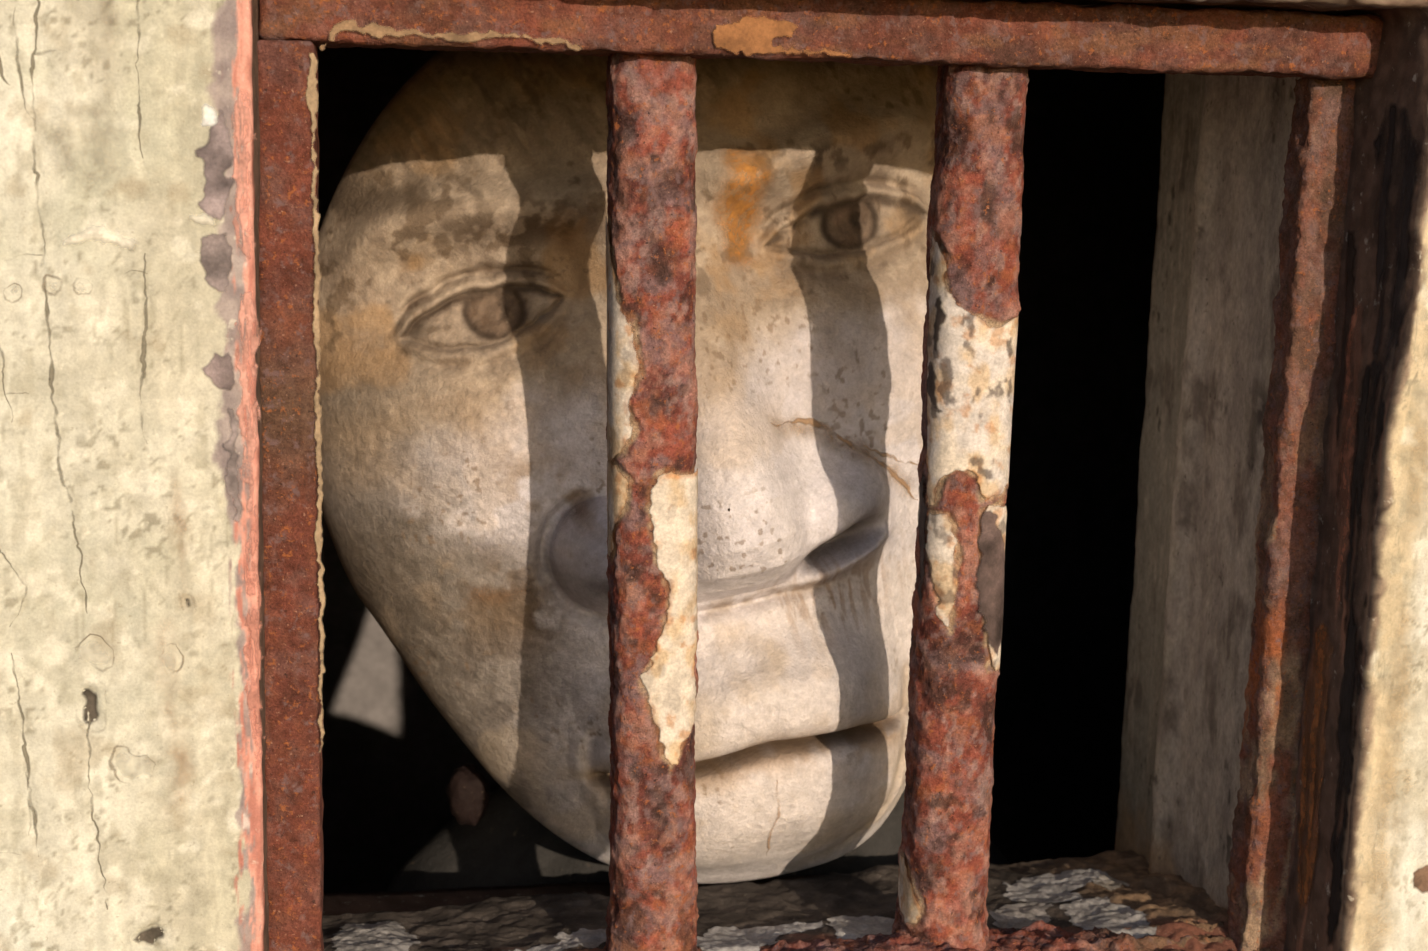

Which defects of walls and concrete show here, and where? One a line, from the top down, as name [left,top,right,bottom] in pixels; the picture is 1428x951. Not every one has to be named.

crack [0,0,40,101]
peeling [196,91,254,291]
crack [2,291,64,485]
crack [140,253,148,391]
peeling [605,217,639,557]
peeling [640,469,698,765]
rust [918,475,927,607]
rust [926,297,946,412]
peeling [925,236,1019,626]
rust [976,511,1005,654]
rust [1337,307,1358,604]
crack [9,626,37,834]